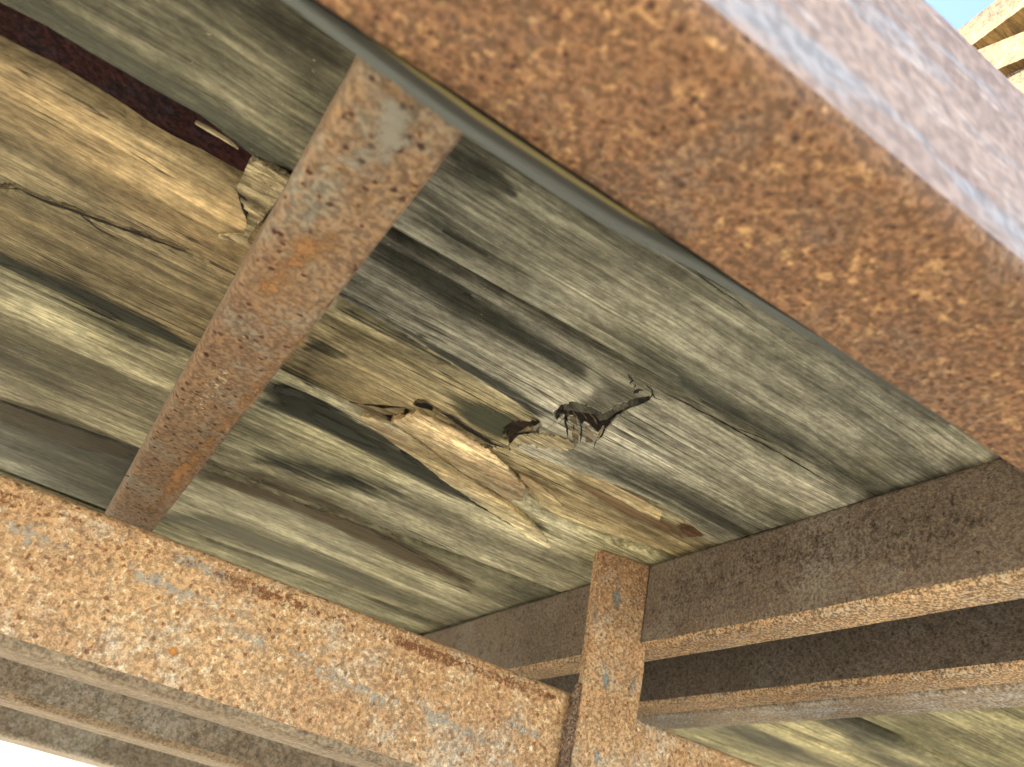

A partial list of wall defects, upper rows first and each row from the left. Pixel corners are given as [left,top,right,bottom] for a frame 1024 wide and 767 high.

rust [0,2,252,172]
crack [5,188,205,261]
peeling [218,155,291,244]
peeling [506,398,639,451]
crack [564,374,848,493]
peeling [571,469,662,521]